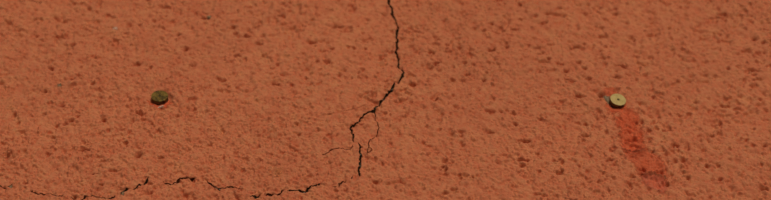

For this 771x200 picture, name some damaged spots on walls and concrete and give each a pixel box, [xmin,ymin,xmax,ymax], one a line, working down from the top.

crack [31,0,404,200]
rust [603,87,668,194]